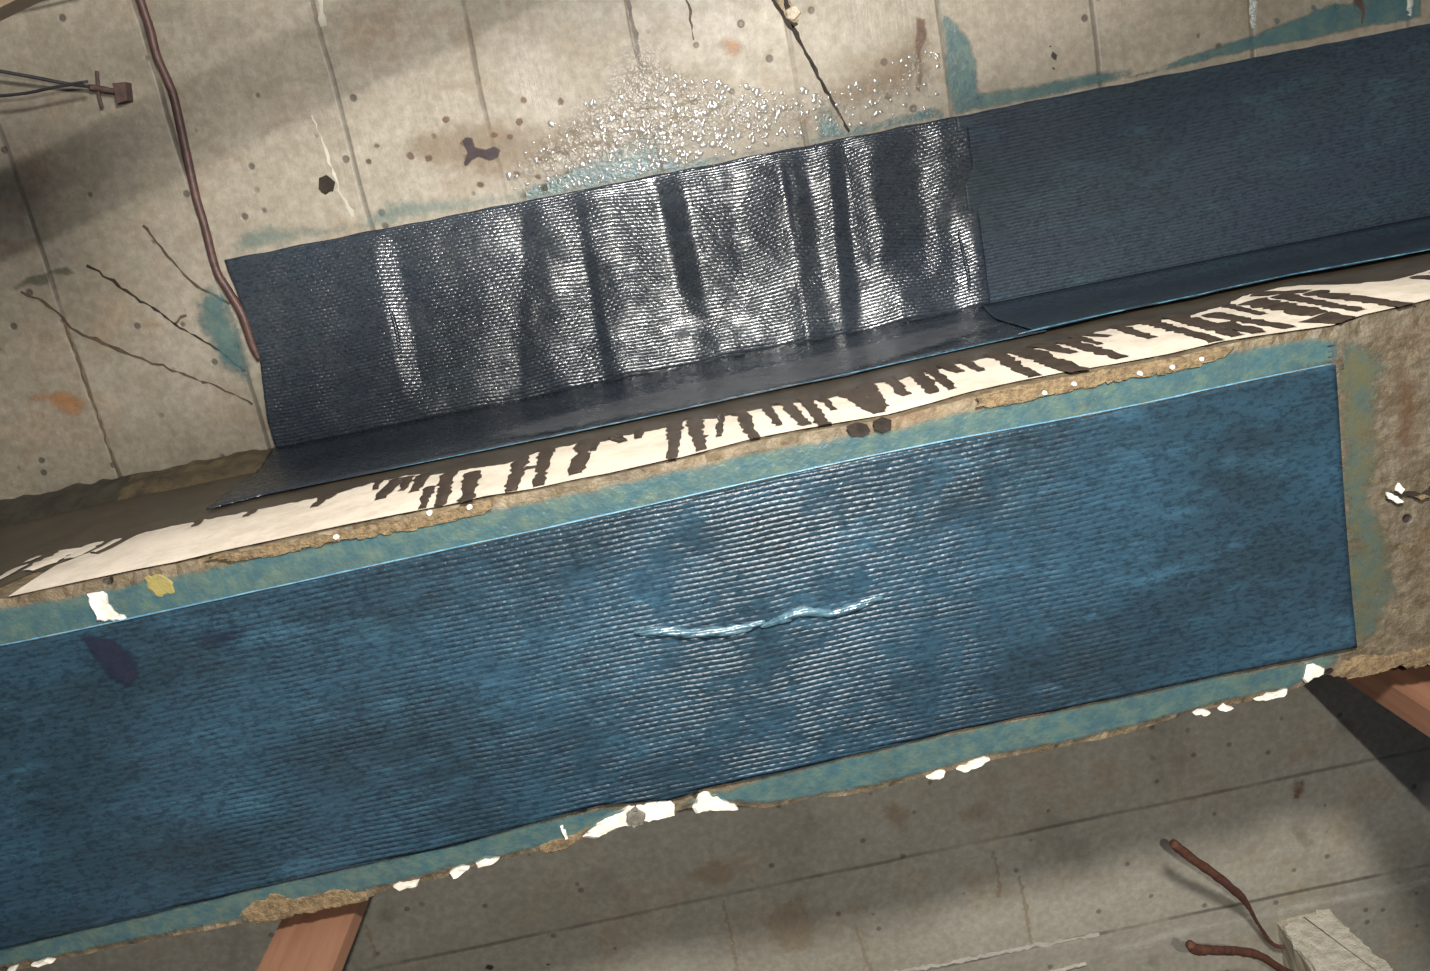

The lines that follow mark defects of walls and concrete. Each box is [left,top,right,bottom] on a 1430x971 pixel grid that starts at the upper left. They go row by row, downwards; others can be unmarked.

crack [772,0,850,132]
water stain [506,18,1116,200]
spalling [0,24,1430,597]
spalling [0,363,1430,950]
spalling [7,957,56,971]